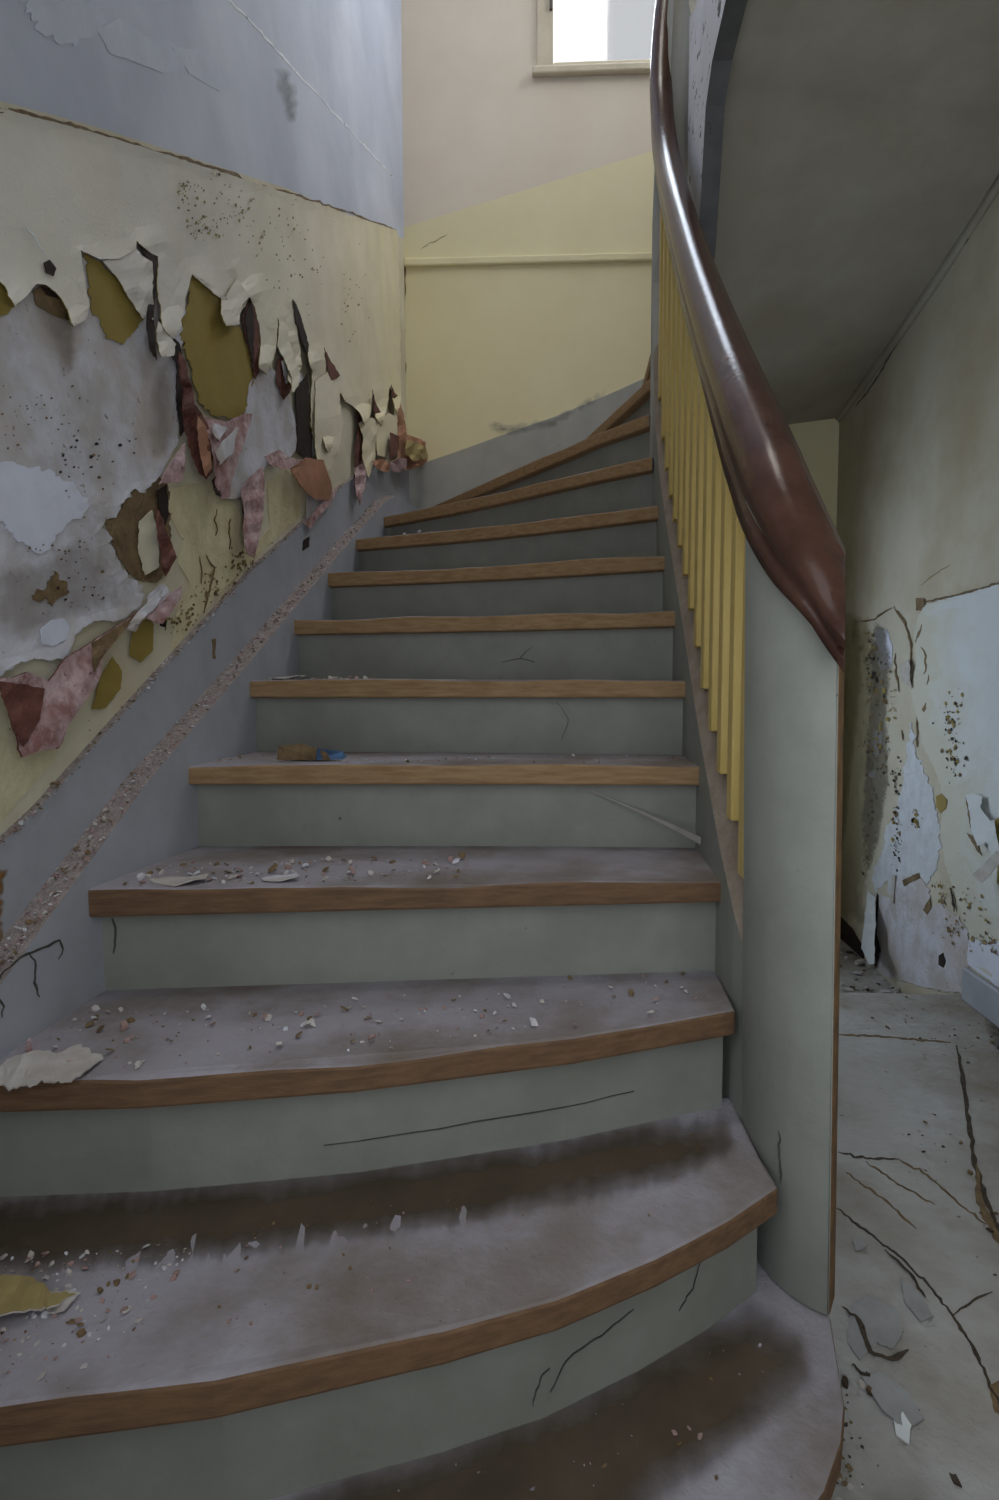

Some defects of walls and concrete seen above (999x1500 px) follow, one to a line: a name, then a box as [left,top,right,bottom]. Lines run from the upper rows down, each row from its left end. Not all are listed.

peeling [0,109,428,821]
peeling [840,585,999,993]
peeling [149,873,209,887]
peeling [261,873,300,882]
peeling [0,1038,103,1092]
crack [837,1034,999,1414]
crack [679,1263,700,1312]
crack [533,1309,634,1406]